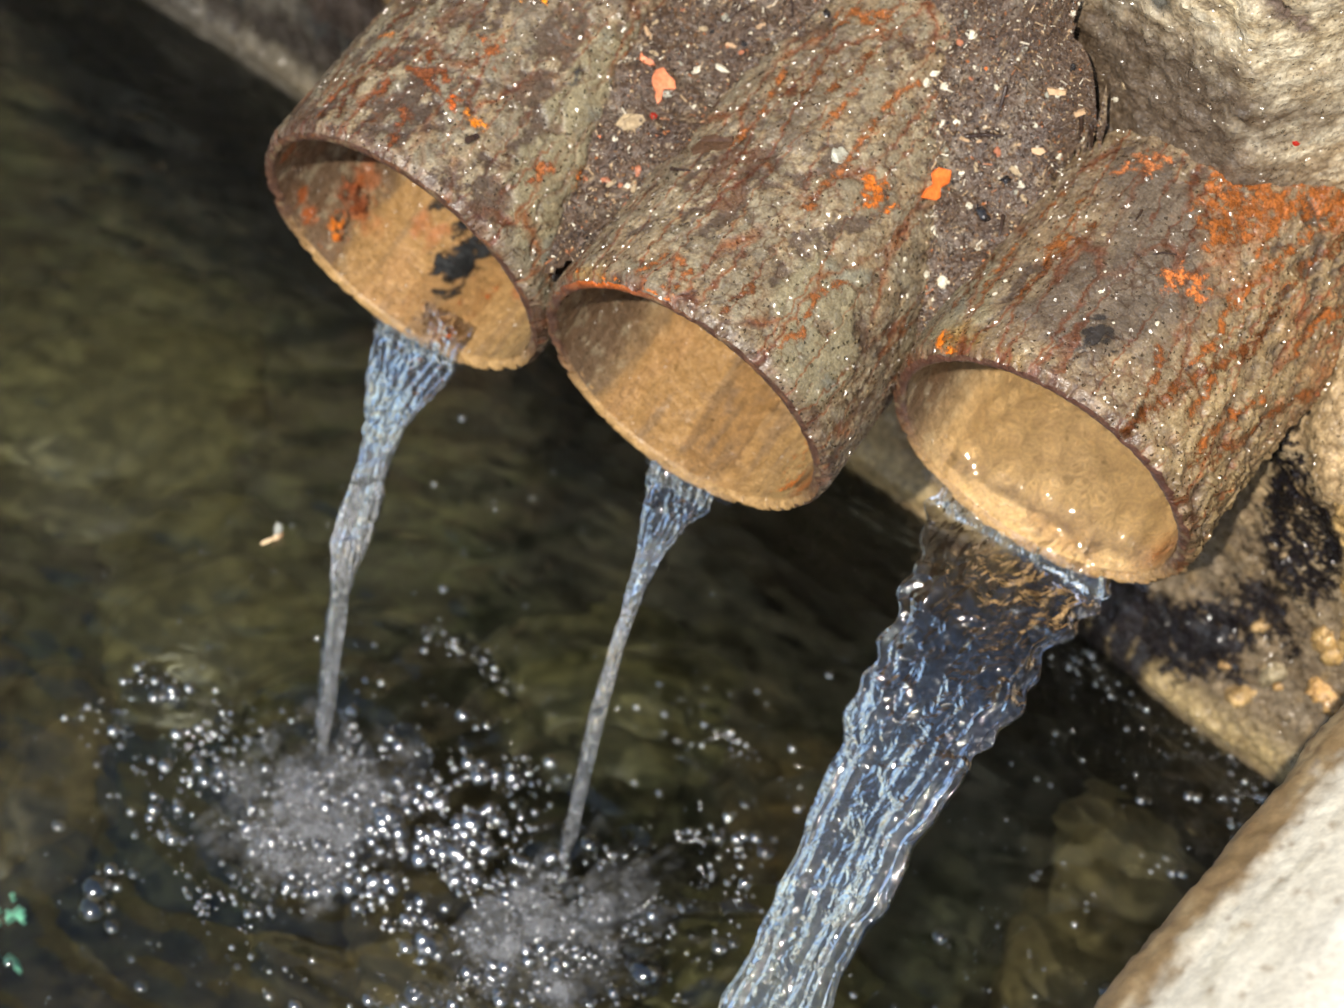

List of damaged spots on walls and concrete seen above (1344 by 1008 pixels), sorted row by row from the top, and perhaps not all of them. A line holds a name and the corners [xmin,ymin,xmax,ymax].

damp [207,0,387,75]
corrosion [312,7,487,129]
corrosion [801,50,873,130]
corrosion [799,79,924,214]
corrosion [1105,151,1173,177]
corrosion [1014,191,1097,299]
corrosion [720,282,757,314]
corrosion [777,279,850,349]
corrosion [935,330,957,354]
corrosion [1120,166,1344,442]
corrosion [1188,387,1315,471]
damp [1009,426,1344,689]